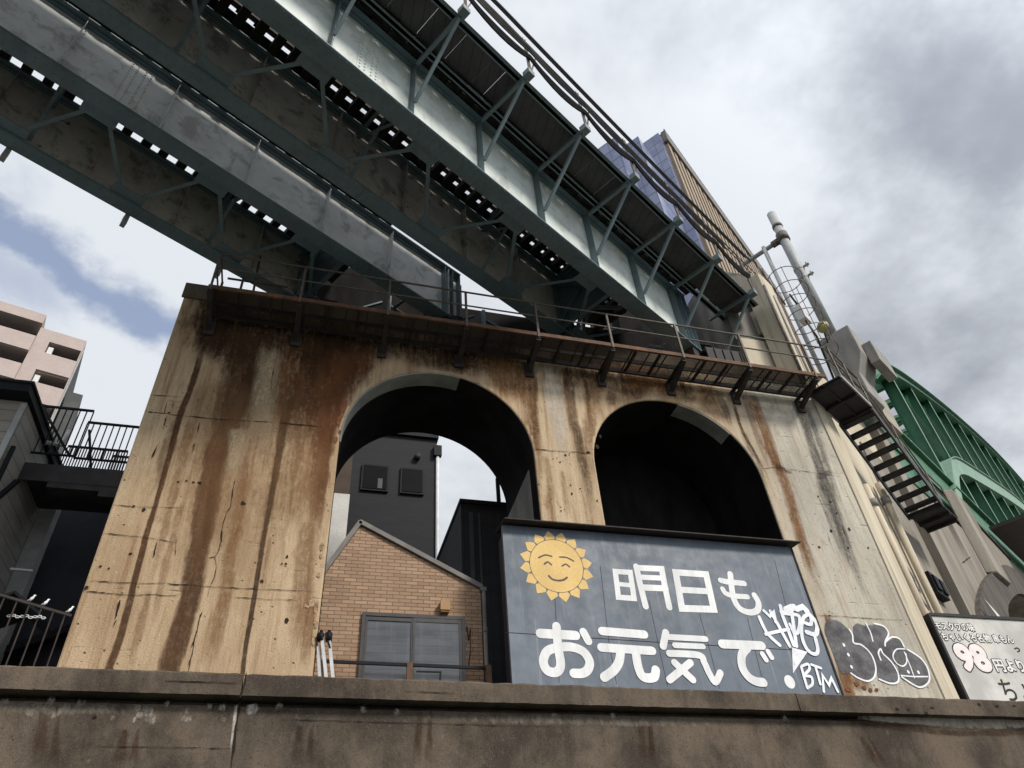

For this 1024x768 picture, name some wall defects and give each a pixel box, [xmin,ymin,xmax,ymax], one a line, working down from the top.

corrosion [106,357,201,669]
corrosion [160,343,260,672]
corrosion [240,410,289,675]
corrosion [488,356,540,449]
corrosion [564,376,595,471]
corrosion [621,366,693,399]
corrosion [725,400,810,560]
damp [797,411,851,557]
crack [88,481,314,768]